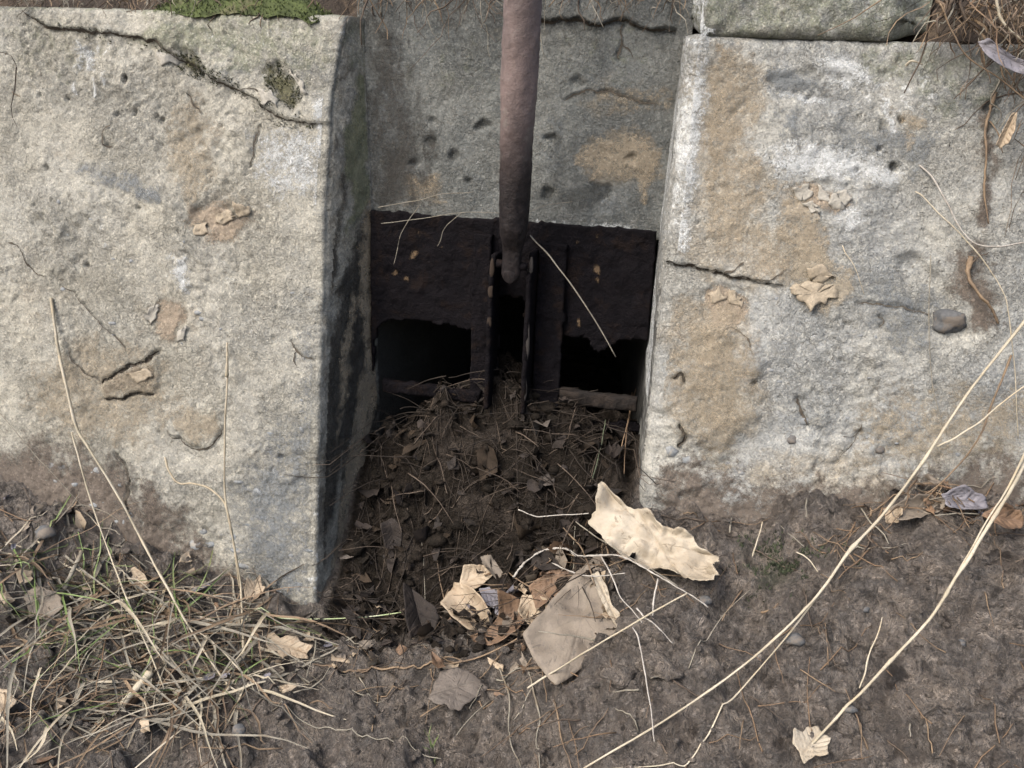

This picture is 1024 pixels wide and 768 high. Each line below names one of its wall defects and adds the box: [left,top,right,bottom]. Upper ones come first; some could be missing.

crack [541,18,674,58]
crack [24,12,321,164]
crack [666,261,786,285]
damp [323,26,435,564]
crack [856,302,931,327]